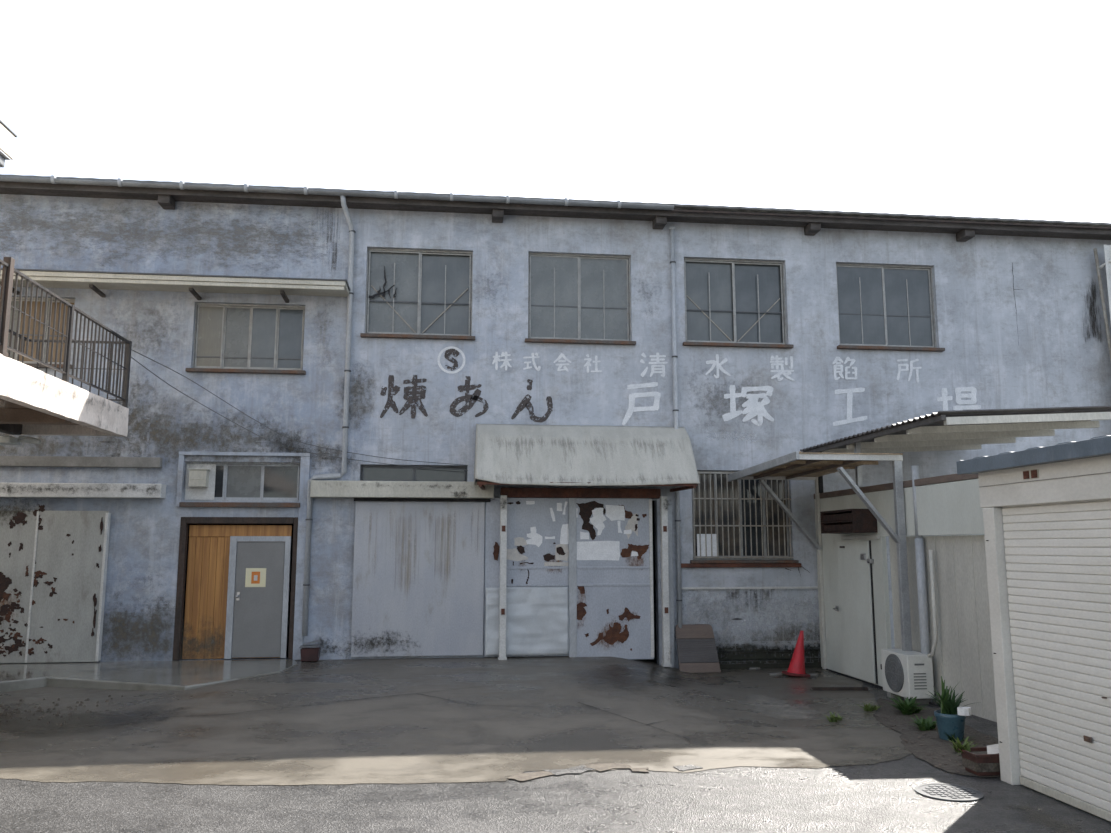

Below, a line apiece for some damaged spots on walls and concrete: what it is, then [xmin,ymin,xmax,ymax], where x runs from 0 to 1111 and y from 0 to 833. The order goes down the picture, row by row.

leakage [0,384,349,464]
corrosion [8,504,45,558]
peeling [507,502,638,566]
corrosion [576,501,606,540]
corrosion [619,505,647,531]
corrosion [620,544,649,566]
corrosion [0,561,57,657]
leakage [103,604,171,657]
leakage [319,632,407,653]
corrosion [577,586,641,651]